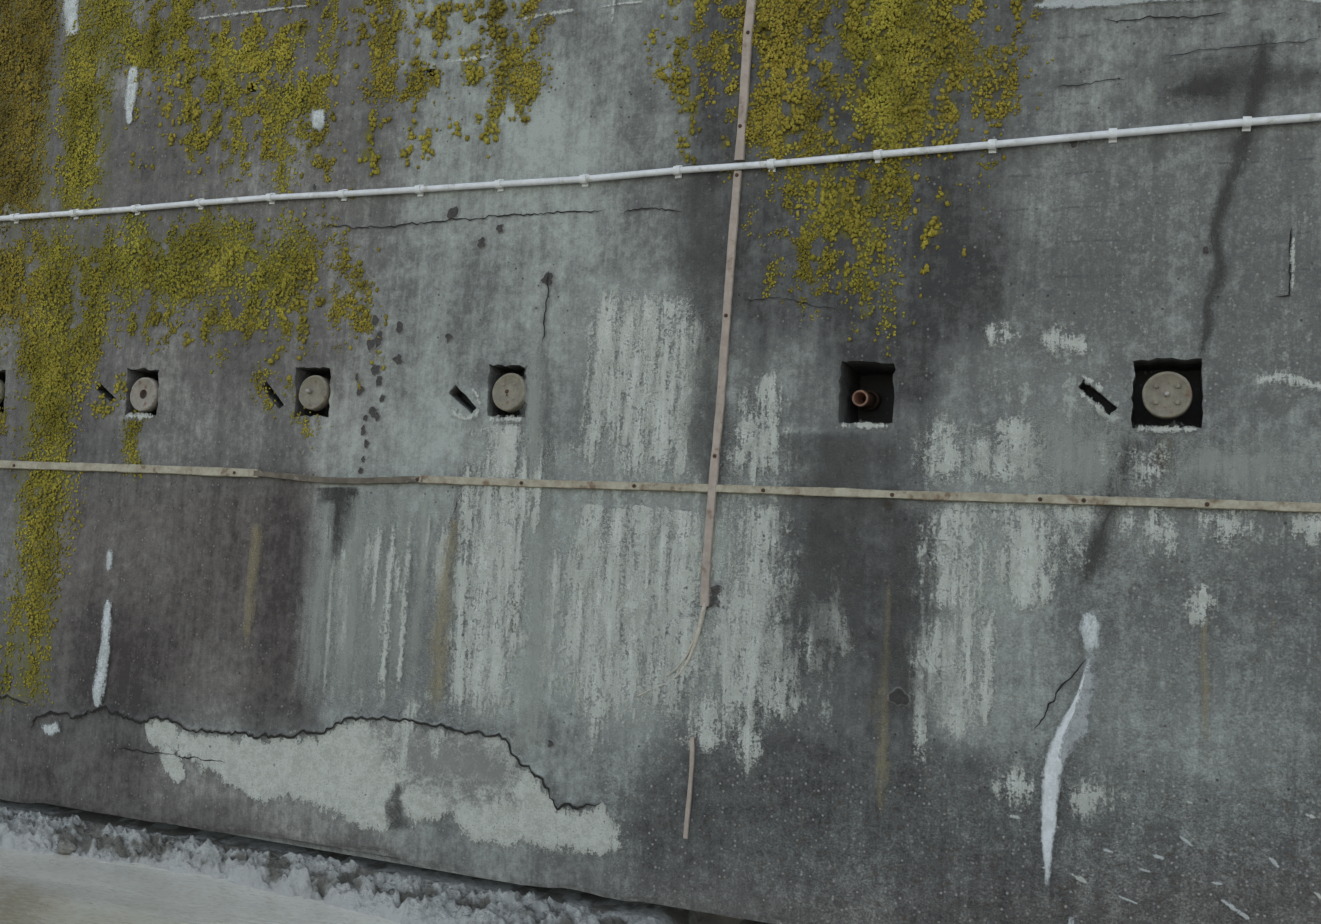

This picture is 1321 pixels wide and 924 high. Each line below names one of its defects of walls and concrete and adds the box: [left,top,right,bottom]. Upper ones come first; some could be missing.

crack [1107,13,1221,22]
crack [1059,78,1125,87]
crack [1168,36,1310,356]
damp [1042,323,1093,355]
damp [303,289,855,774]
damp [1288,512,1321,546]
damp [904,414,1285,761]
damp [92,600,112,707]
crack [0,691,603,810]
spalling [144,699,622,857]
damp [992,763,1034,807]
damp [1063,775,1130,821]